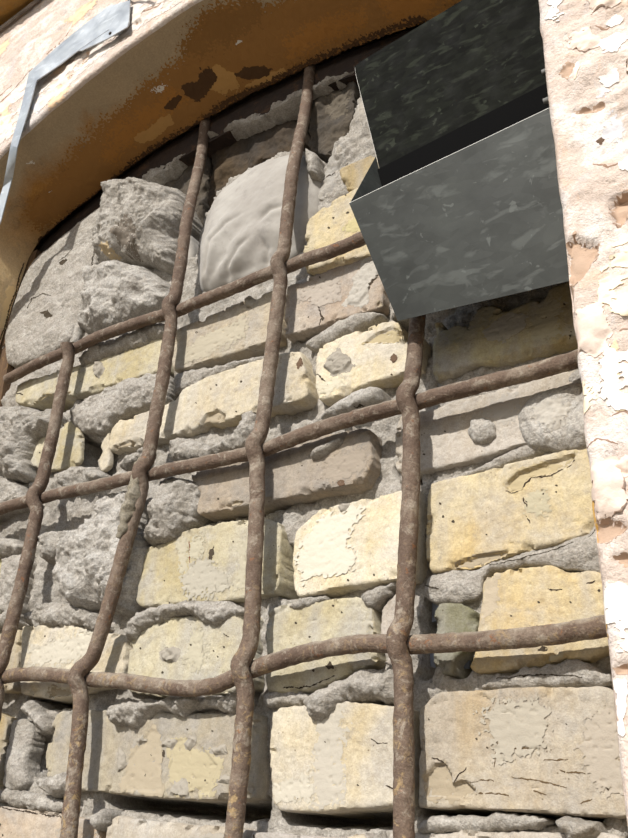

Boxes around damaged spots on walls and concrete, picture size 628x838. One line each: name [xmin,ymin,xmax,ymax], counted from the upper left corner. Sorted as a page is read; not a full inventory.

corrosion [19,0,462,232]
spalling [574,101,605,114]
corrosion [292,274,342,309]
peeling [563,231,628,316]
peeling [582,344,628,414]
crack [506,438,618,523]
corrosion [232,540,247,592]
corrosion [480,573,501,625]
peeling [597,582,628,653]
peeling [613,663,628,737]
crack [432,741,585,796]
corrosion [572,704,624,798]